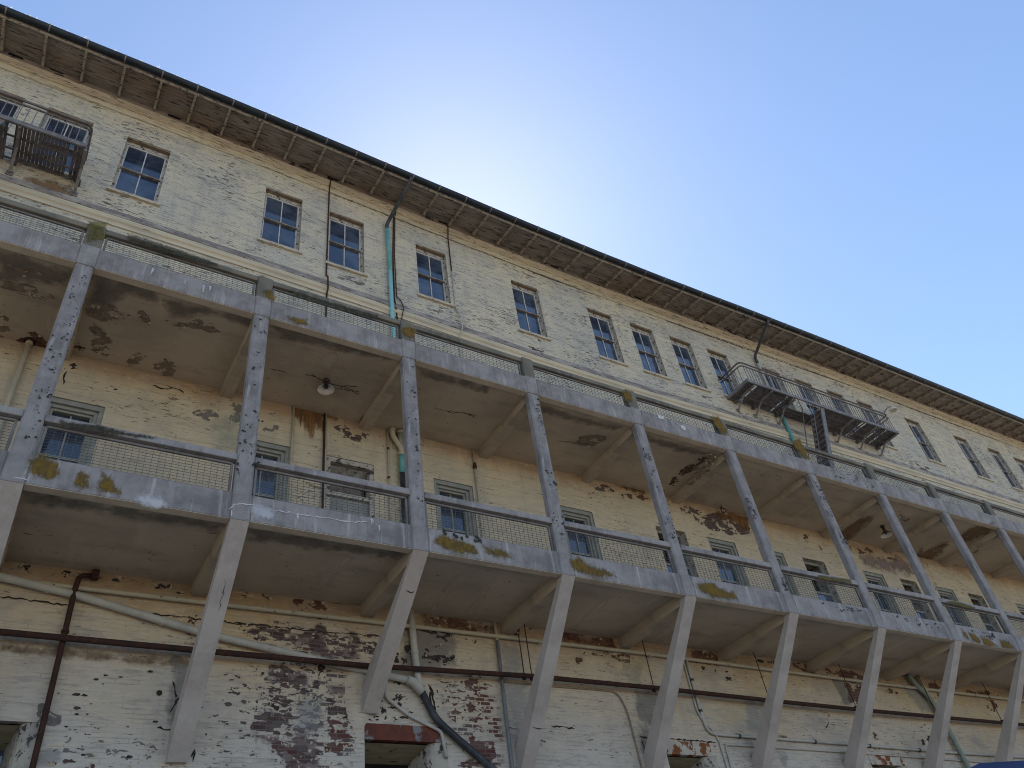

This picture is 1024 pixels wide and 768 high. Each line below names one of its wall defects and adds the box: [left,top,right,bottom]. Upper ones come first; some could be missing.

peeling [70,304,151,370]
peeling [192,403,242,425]
spalling [664,453,717,491]
peeling [680,506,750,535]
peeling [205,599,377,768]
peeling [792,663,864,704]
peeling [437,675,503,768]